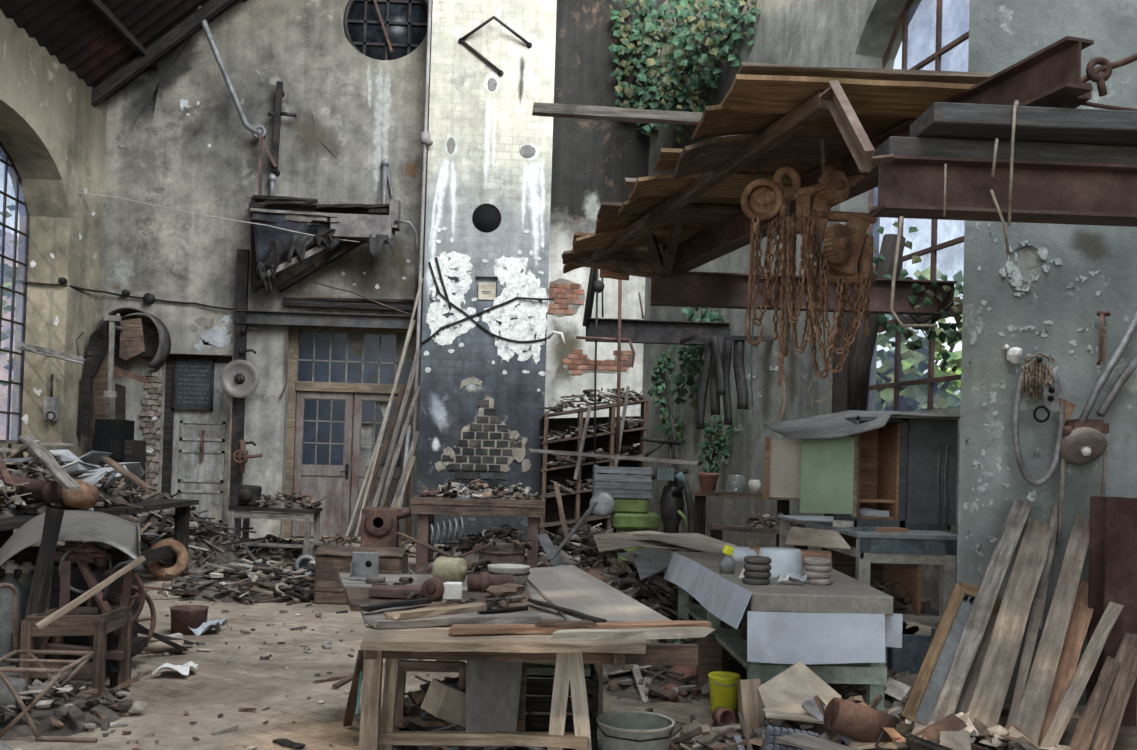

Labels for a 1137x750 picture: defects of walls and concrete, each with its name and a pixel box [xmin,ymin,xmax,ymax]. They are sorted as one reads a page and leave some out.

damp [484,75,497,178]
damp [427,137,456,289]
peeling [424,226,585,392]
damp [520,145,545,255]
spalling [970,222,1063,297]
spalling [563,349,633,375]
spalling [435,395,531,487]